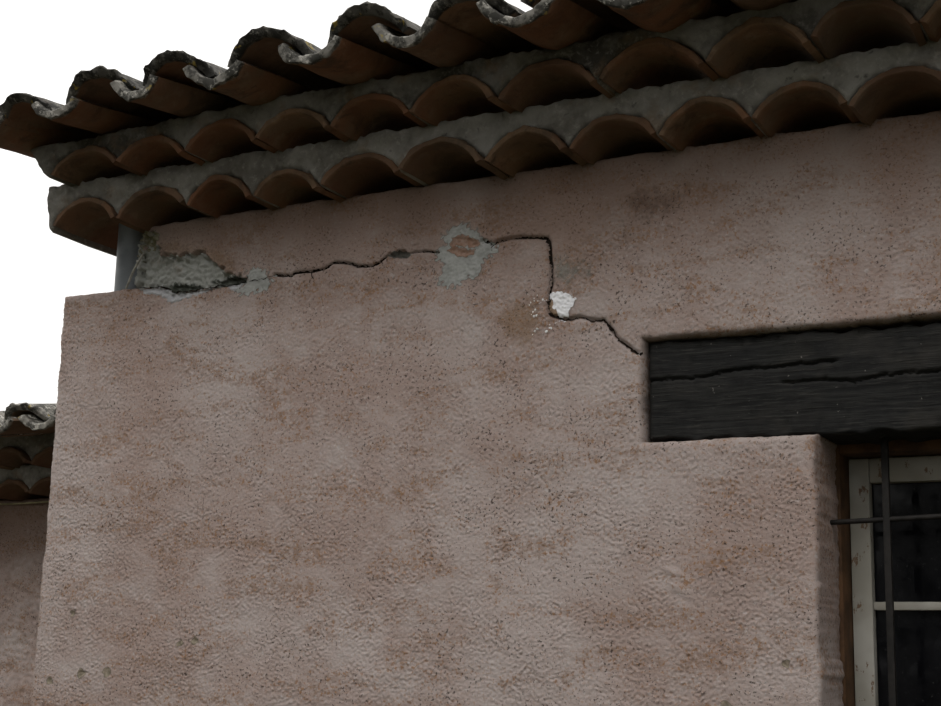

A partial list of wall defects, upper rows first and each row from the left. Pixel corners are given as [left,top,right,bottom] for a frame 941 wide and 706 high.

spalling [134,231,247,303]
crack [251,257,387,281]
flaking render [529,291,577,335]
crack [484,237,643,356]